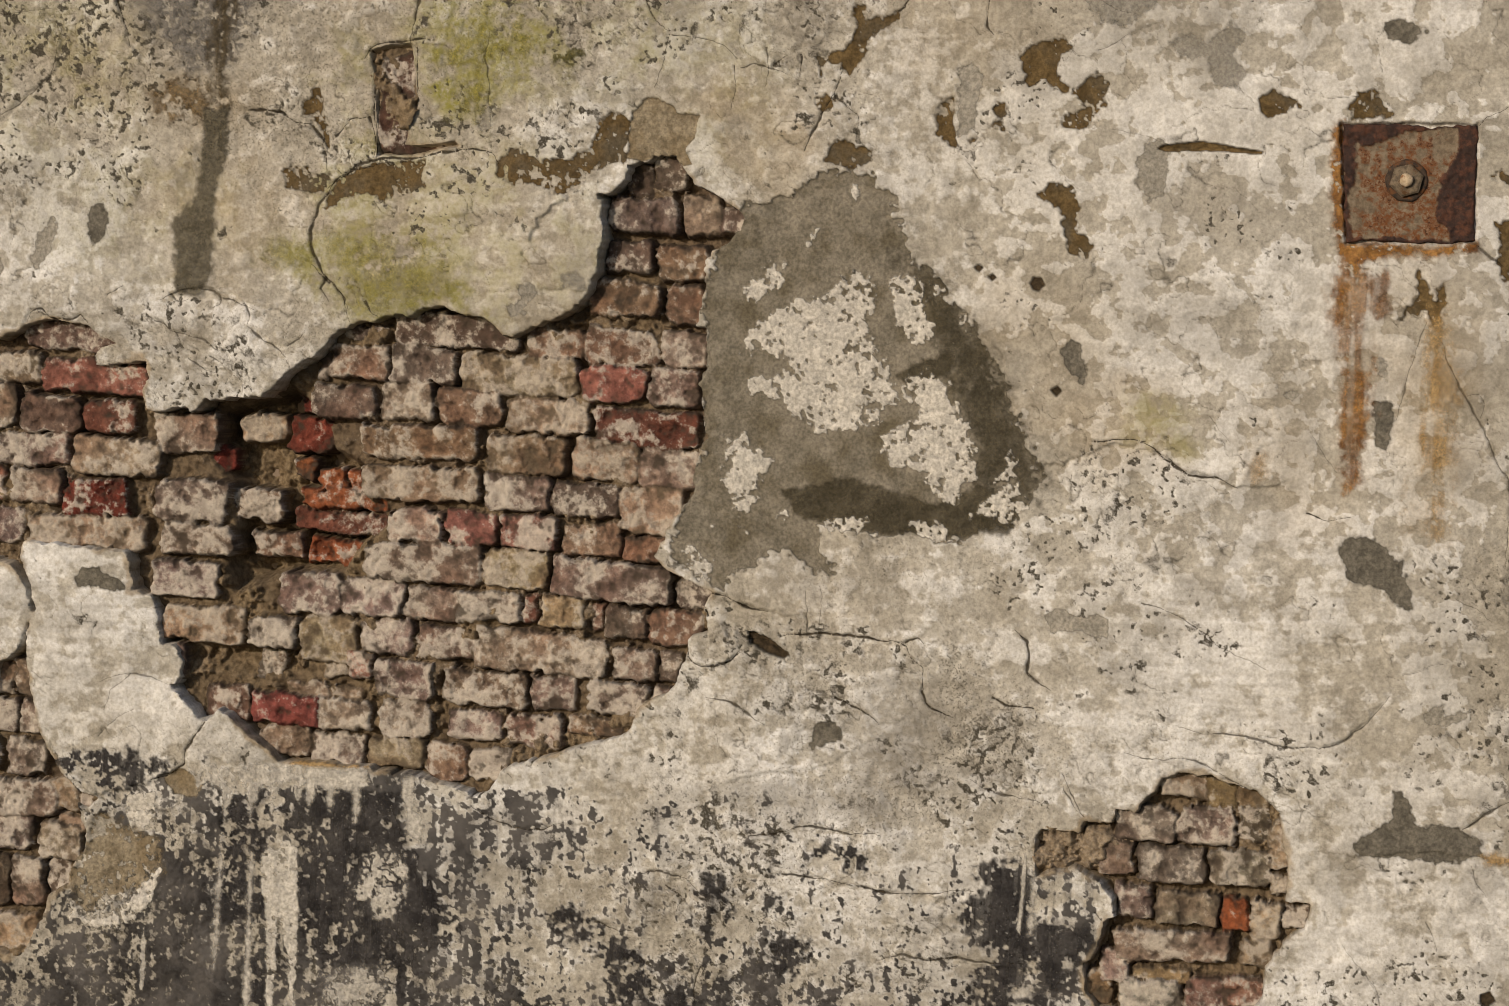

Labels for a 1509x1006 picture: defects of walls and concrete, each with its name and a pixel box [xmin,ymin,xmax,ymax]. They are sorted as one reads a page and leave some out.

water stain [148,0,250,296]
crack [247,0,499,322]
peeling [1037,183,1094,259]
rust [1330,124,1479,495]
spalling [0,98,1047,957]
crack [688,592,949,725]
crack [991,630,1050,718]
water stain [213,768,462,1006]
water stain [544,903,696,1006]
water stain [957,858,1096,1006]
spalling [1032,772,1313,1006]
peeling [1353,791,1483,864]